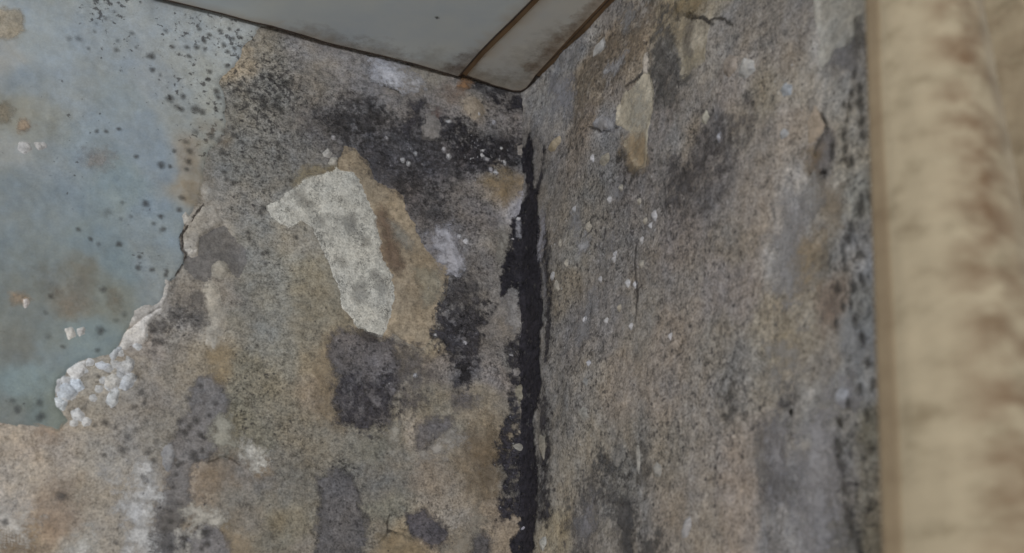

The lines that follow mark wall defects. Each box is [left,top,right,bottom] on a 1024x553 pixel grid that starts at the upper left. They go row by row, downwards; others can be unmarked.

damp [334,56,427,141]
damp [468,80,523,111]
peeling [0,0,265,432]
spalling [266,146,449,348]
damp [326,327,431,444]
damp [405,115,555,553]